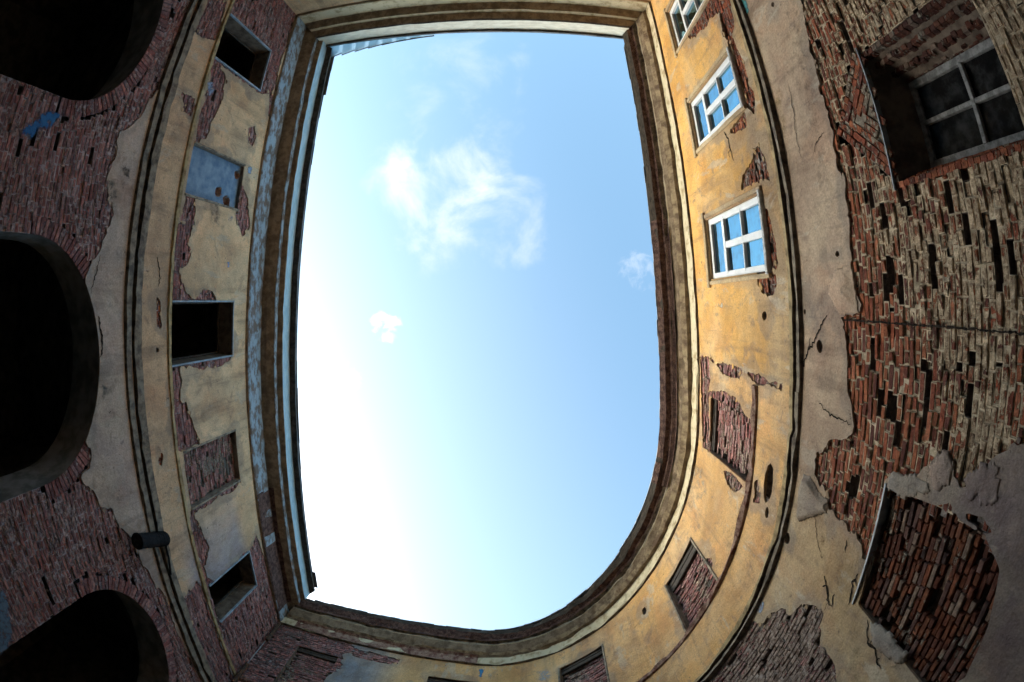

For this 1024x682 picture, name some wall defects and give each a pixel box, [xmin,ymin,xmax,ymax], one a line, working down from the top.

peeling [689,0,755,134]
peeling [0,0,191,279]
peeling [156,196,215,328]
peeling [236,185,249,236]
peeling [700,355,782,451]
peeling [743,142,770,189]
peeling [797,0,1024,577]
crack [803,315,1024,367]
peeling [0,441,200,682]
peeling [709,604,836,682]